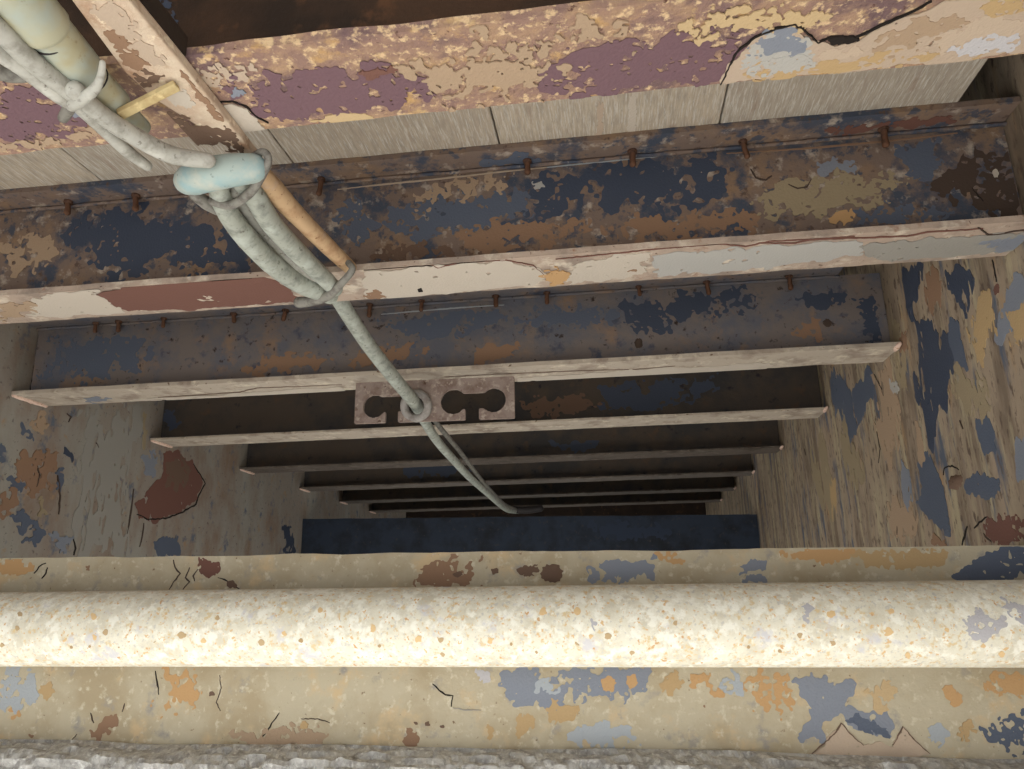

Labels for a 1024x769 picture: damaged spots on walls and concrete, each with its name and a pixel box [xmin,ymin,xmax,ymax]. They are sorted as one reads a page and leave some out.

crack [720,0,932,85]
peeling [787,0,1024,76]
corrosion [369,167,910,262]
peeling [566,232,1024,285]
peeling [0,289,125,322]
corrosion [363,289,386,299]
peeling [361,260,547,299]
peeling [517,362,773,382]
crack [169,560,239,590]
crack [433,684,481,711]
crack [812,723,864,754]
crack [892,726,930,754]